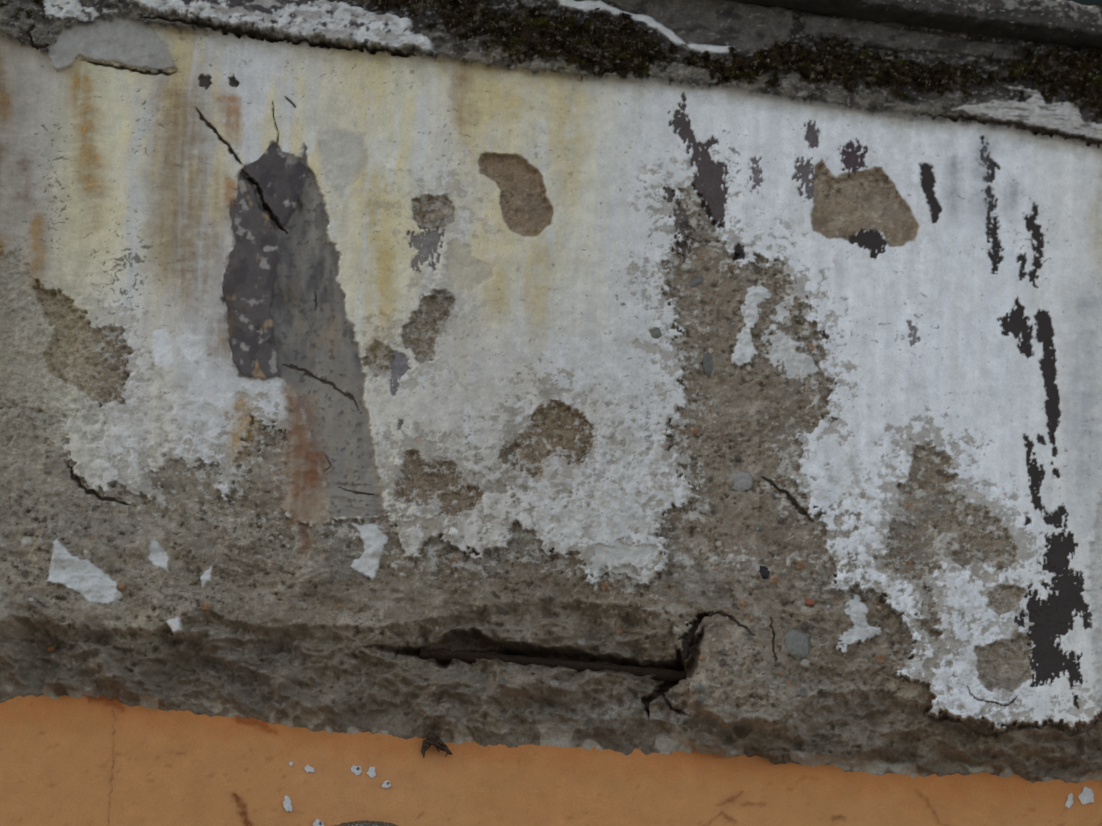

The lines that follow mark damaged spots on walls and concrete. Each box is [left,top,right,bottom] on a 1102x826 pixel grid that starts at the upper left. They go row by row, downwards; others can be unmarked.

crack [197,108,242,164]
crack [272,96,296,142]
peeling [318,127,370,197]
spalling [0,135,1102,783]
crack [363,610,778,717]
peeling [1065,786,1094,808]